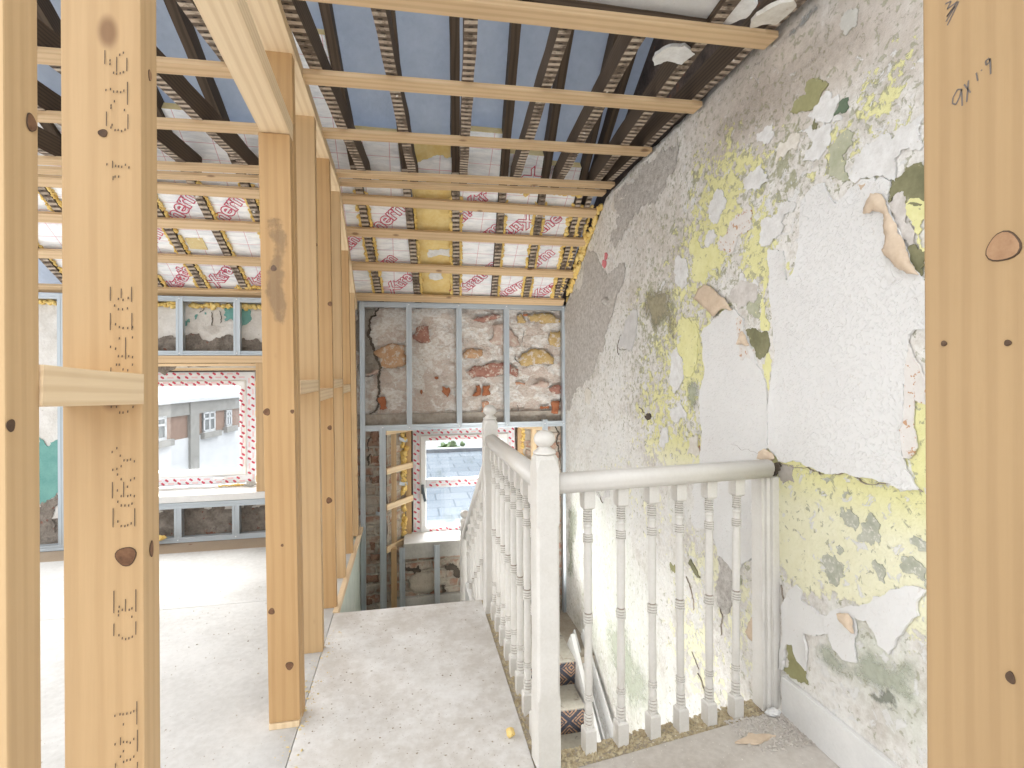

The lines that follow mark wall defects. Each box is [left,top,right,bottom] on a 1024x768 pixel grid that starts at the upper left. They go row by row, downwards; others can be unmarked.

peeling [756,77,925,280]
peeling [659,189,796,291]
crack [365,308,382,482]
flaking render [356,308,431,377]
peeling [659,316,699,450]
peeling [728,267,772,390]
peeling [39,437,58,544]
crack [736,445,888,485]
peeling [822,545,845,587]
peeling [840,491,881,545]
peeling [899,535,926,588]
peeling [784,645,809,685]